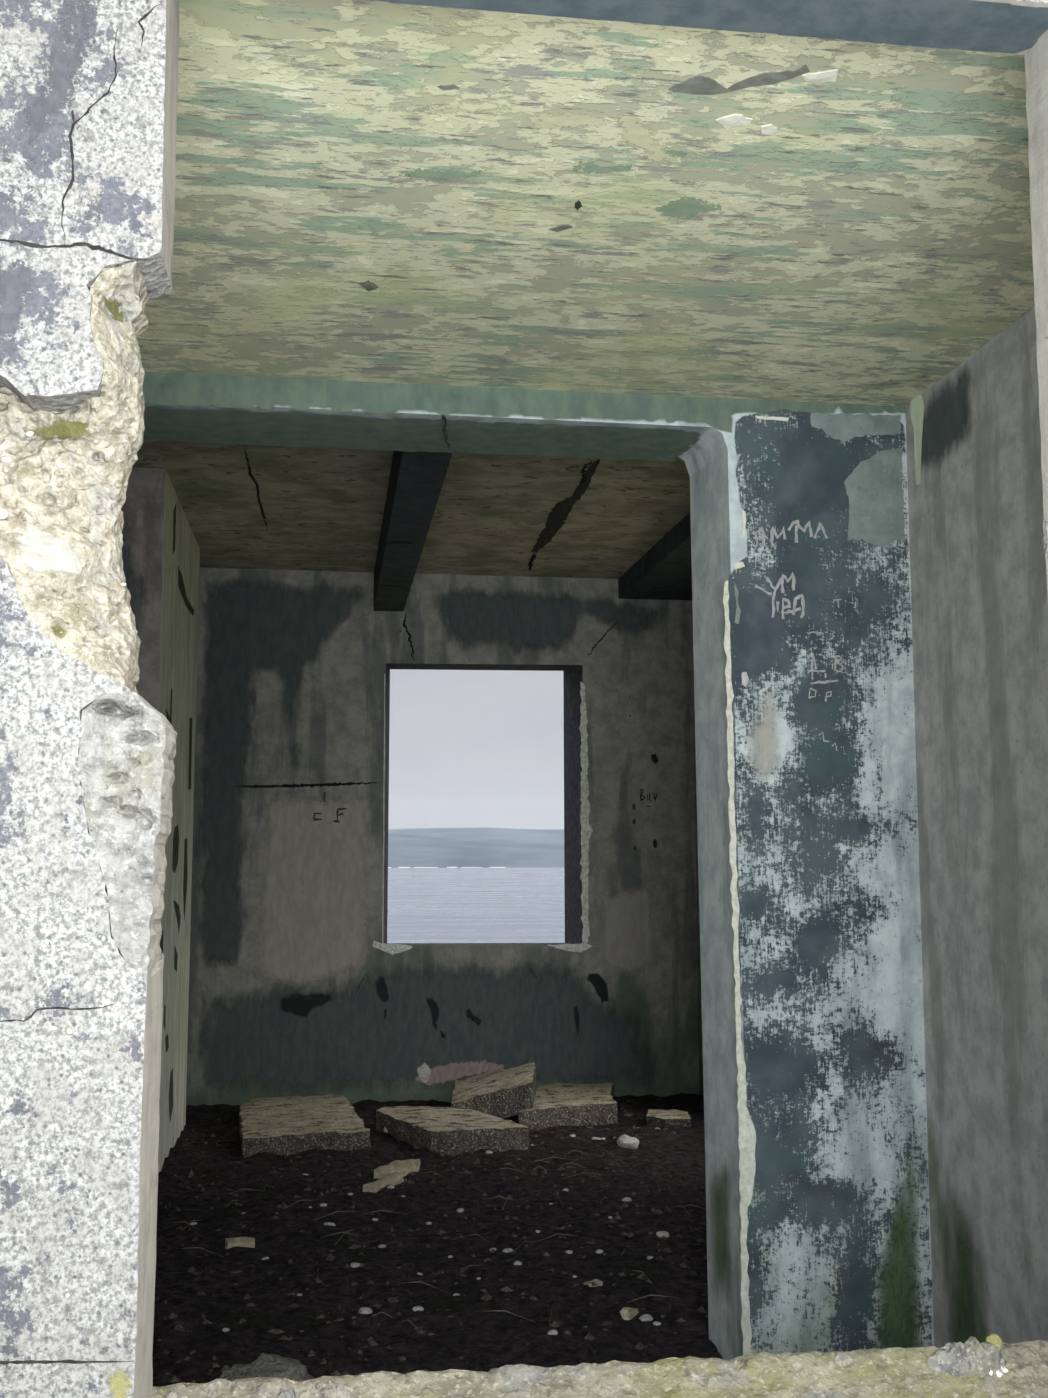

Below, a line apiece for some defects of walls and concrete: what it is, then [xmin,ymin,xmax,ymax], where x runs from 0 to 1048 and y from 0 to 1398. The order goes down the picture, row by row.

peeling [668,64,838,95]
crack [0,4,160,260]
peeling [716,114,777,135]
crack [242,445,268,531]
spalling [0,261,194,981]
leakage [439,590,657,652]